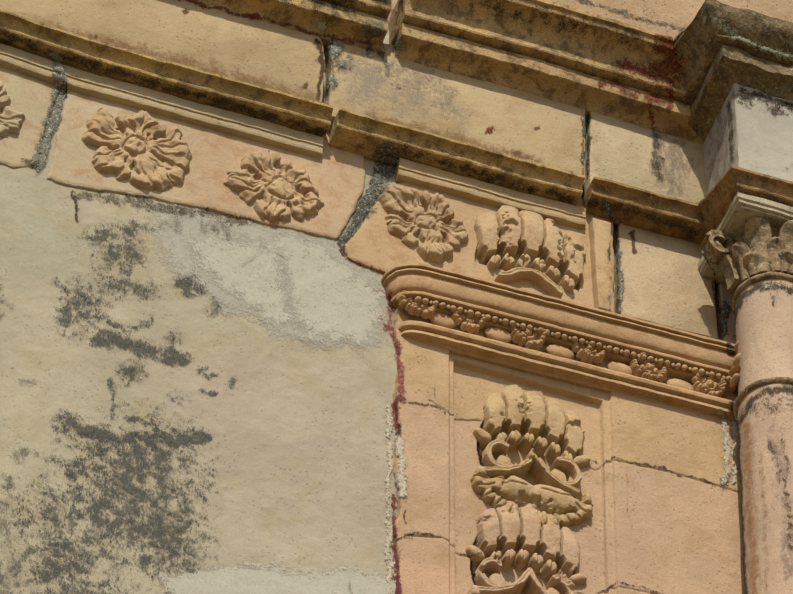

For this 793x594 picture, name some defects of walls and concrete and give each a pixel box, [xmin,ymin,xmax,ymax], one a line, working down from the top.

rust [598,33,687,126]
peeling [181,231,386,347]
mould [735,278,793,325]
mould [0,190,256,594]
crack [339,248,446,594]
crack [587,456,732,491]
damp [737,384,793,426]
damp [767,438,793,549]